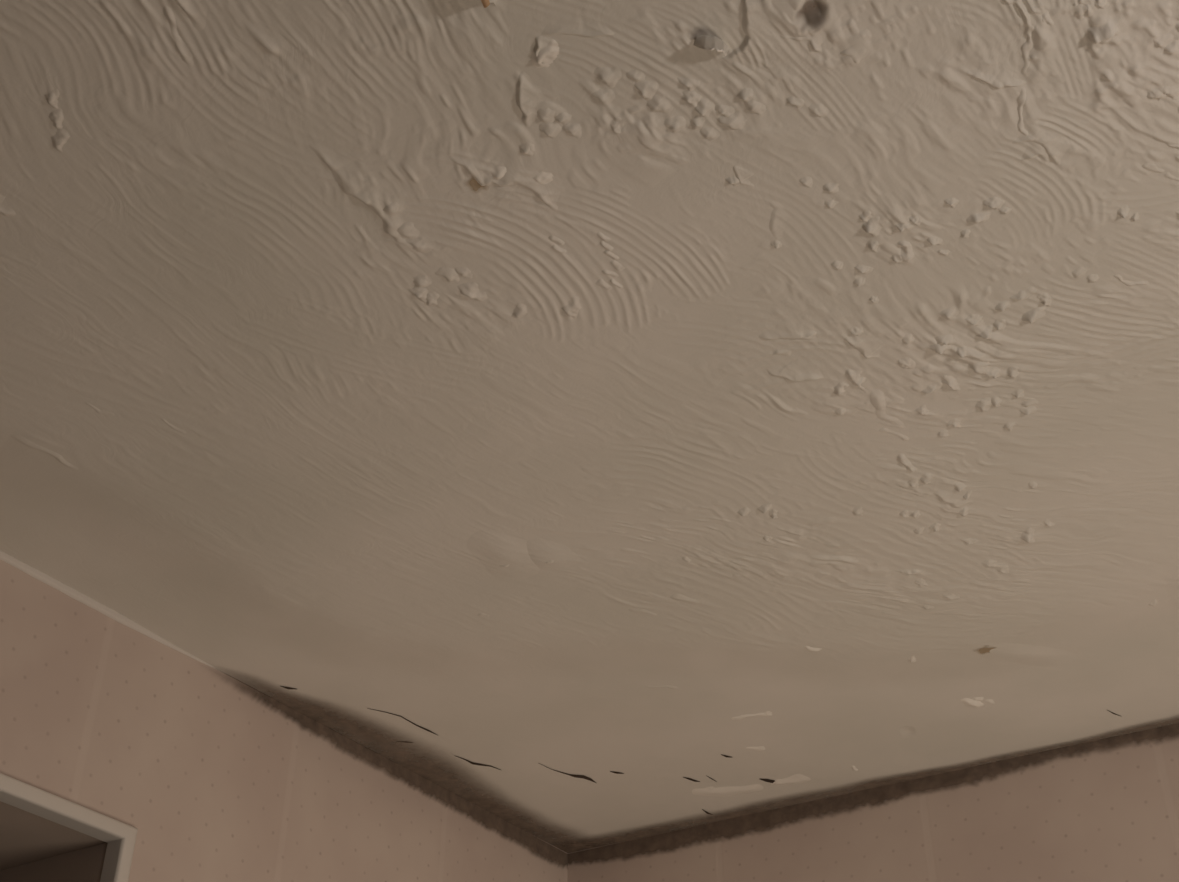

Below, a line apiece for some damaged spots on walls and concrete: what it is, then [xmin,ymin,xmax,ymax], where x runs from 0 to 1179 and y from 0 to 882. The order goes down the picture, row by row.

crack [367,708,437,743]
crack [456,756,500,770]
crack [539,763,624,783]
crack [683,755,732,815]
mould [242,682,1179,866]